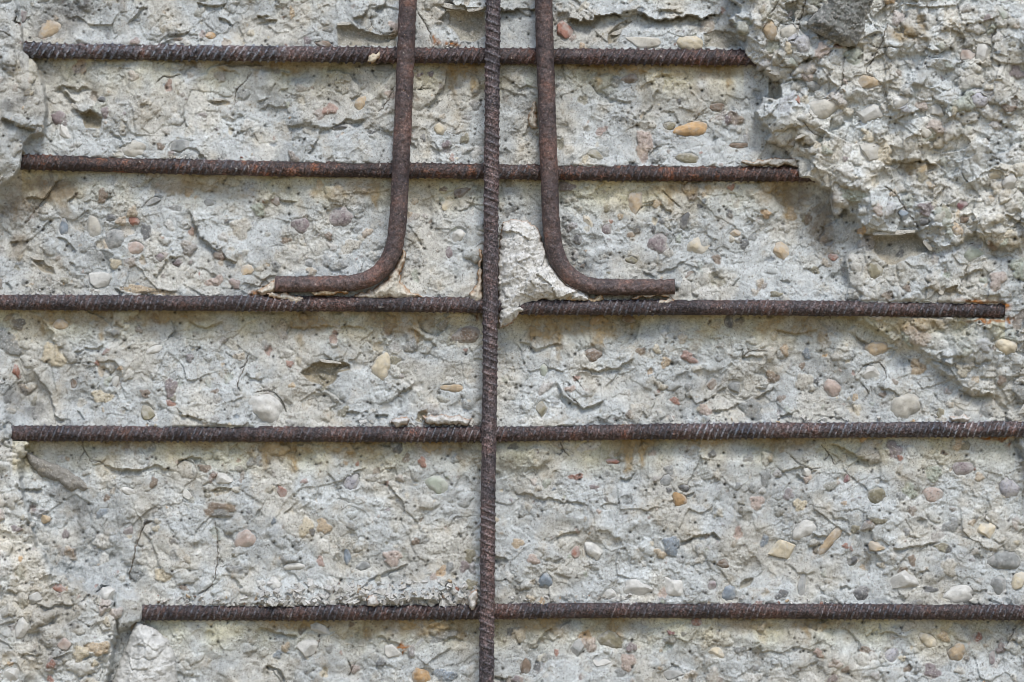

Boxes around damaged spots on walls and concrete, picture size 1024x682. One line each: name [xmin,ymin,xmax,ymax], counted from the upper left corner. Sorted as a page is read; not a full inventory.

spalling [20,0,485,292]
spalling [0,294,483,313]
rust [525,315,635,344]
spalling [409,0,1024,682]
spalling [300,359,352,389]
spalling [11,424,482,443]
rust [251,441,298,470]
peeling [26,452,90,492]
spalling [211,487,236,498]
spalling [141,603,480,622]